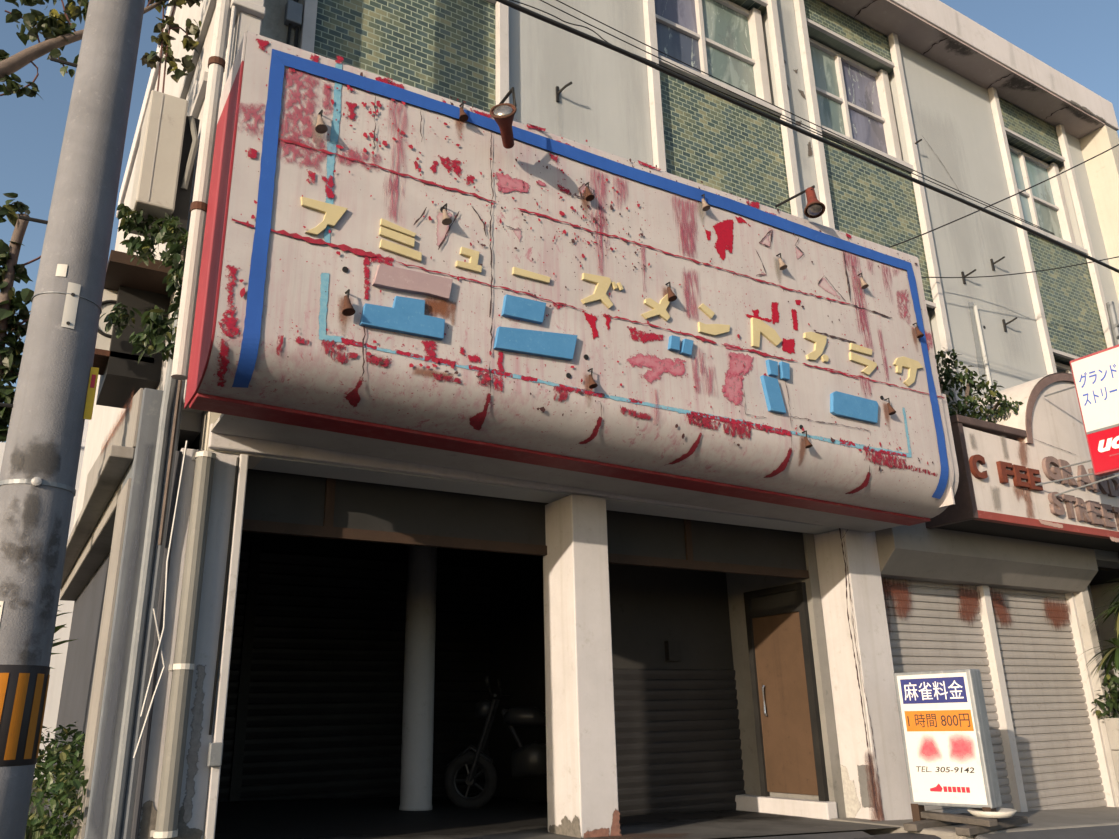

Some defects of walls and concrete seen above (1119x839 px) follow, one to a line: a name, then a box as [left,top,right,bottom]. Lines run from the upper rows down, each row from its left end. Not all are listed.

peeling [302,169,350,208]
spalling [325,72,668,320]
peeling [698,193,813,263]
peeling [276,290,816,446]
leakage [10,443,60,478]
peeling [823,423,938,477]
leakage [22,493,39,531]
corrosion [882,577,911,630]
corrosion [958,586,1011,624]
corrosion [1044,597,1070,628]
spalling [549,809,621,838]